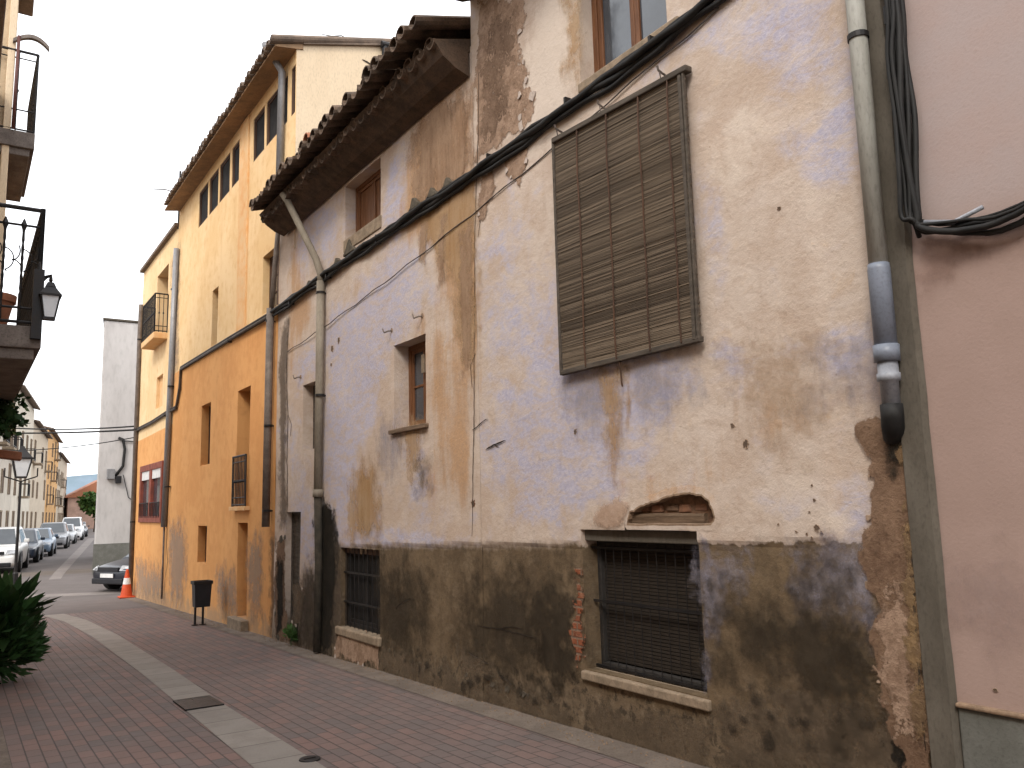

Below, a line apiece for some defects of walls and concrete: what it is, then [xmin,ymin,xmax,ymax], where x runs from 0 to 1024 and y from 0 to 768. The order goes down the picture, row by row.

peeling [473,0,536,163]
leakage [408,81,476,376]
peeling [477,148,528,221]
spalling [593,484,721,531]
leakage [297,499,341,654]
leakage [377,571,427,660]
leakage [464,576,576,694]
spalling [568,567,587,668]
leakage [705,543,873,696]
peeling [854,416,931,768]
leakage [881,719,908,768]